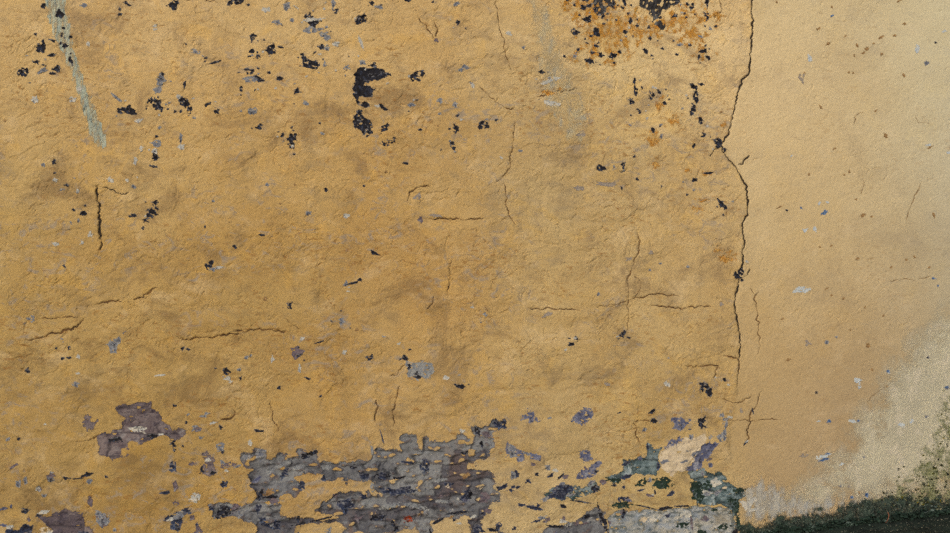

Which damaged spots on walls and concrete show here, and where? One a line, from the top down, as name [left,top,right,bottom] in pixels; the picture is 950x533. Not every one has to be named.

peeling [238,33,284,96]
peeling [261,0,396,146]
peeling [276,126,297,155]
crack [96,187,129,250]
crack [687,0,777,440]
crack [531,234,709,330]
peeling [0,496,117,533]
peeling [15,471,108,498]
peeling [82,401,758,533]
water stain [735,321,950,533]